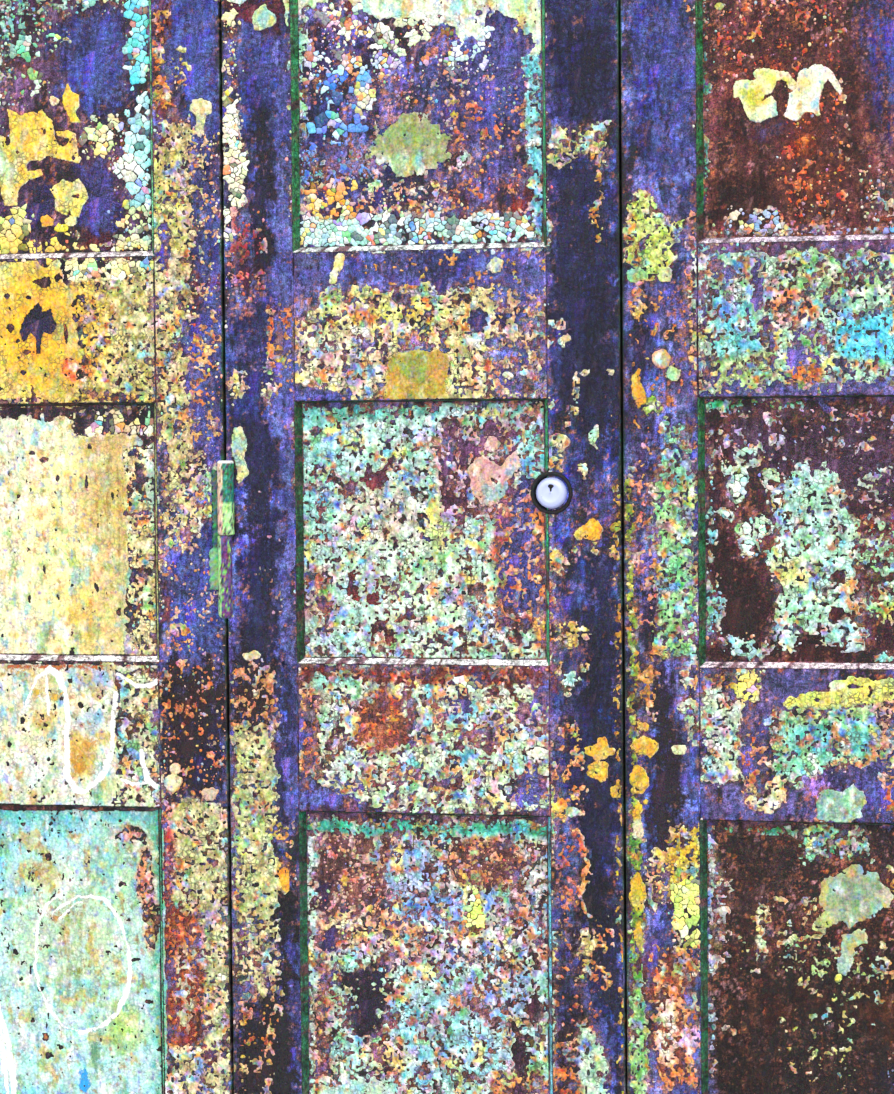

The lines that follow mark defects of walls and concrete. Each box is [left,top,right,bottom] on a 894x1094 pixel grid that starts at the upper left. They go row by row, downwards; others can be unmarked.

corrosion [709,0,893,237]
peeling [622,0,894,661]
peeling [0,0,623,1094]
corrosion [350,458,401,496]
corrosion [301,557,558,758]
corrosion [439,485,476,526]
peeling [609,348,894,1094]
corrosion [162,796,205,1049]
corrosion [640,920,697,1094]
corrosion [711,827,894,1094]